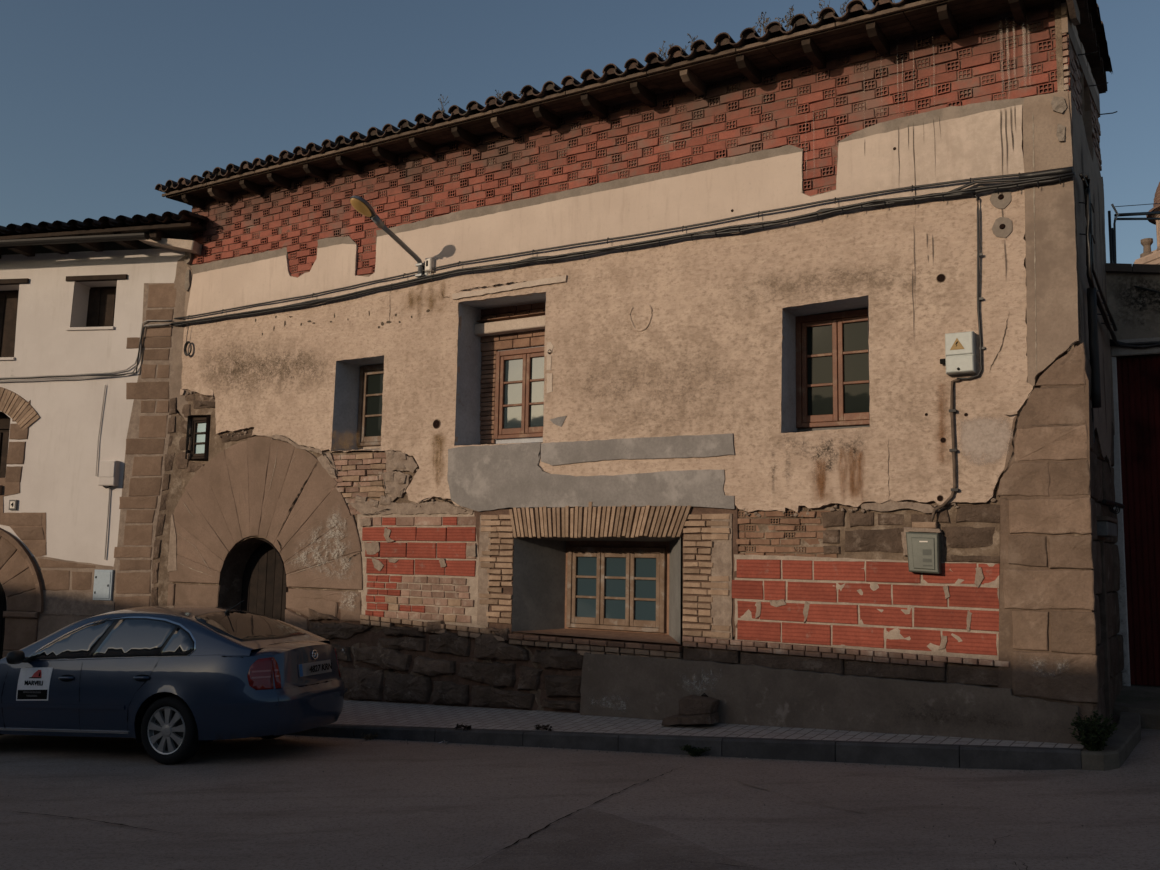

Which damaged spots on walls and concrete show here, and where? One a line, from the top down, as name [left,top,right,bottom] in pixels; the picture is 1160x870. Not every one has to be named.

leakage [898,128,916,196]
leakage [1000,108,1016,169]
leakage [912,235,934,328]
spalling [736,482,1000,563]